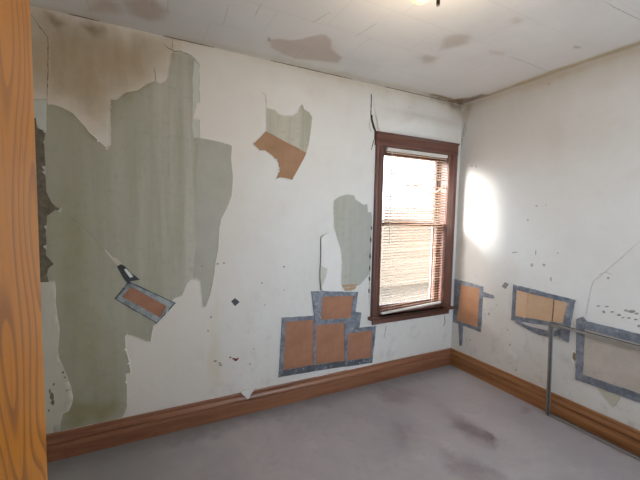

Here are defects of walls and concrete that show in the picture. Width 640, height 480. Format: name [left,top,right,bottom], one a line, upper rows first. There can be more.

flaking render [263,104,312,152]
crack [368,94,376,150]
flaking render [34,52,233,431]
flaking render [334,195,371,285]